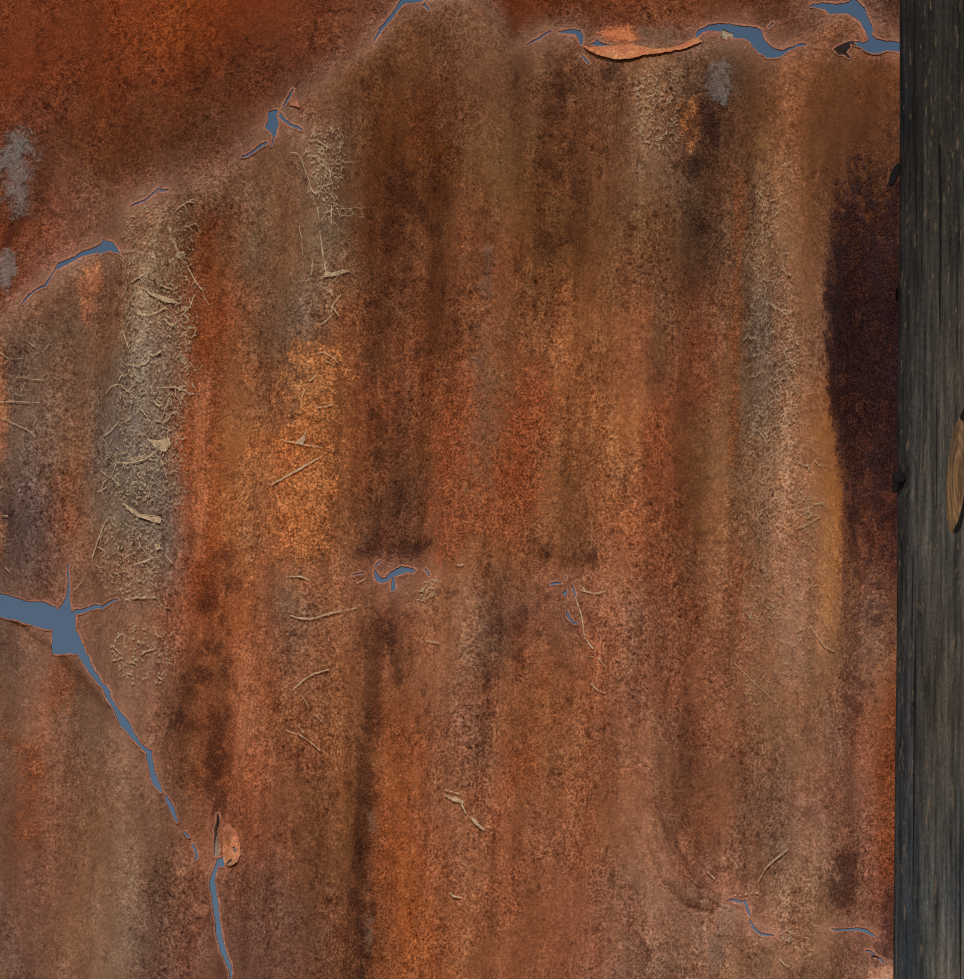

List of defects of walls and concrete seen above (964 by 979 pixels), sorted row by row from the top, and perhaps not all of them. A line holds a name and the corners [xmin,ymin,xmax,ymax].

rust [597,24,639,44]
crack [524,20,808,67]
crack [806,0,900,61]
crack [240,86,305,159]
crack [18,237,122,307]
rust [182,290,234,614]
rust [268,341,355,560]
rust [428,345,555,567]
crack [351,558,436,593]
crack [0,562,241,979]
rust [218,633,263,780]
rust [874,678,896,882]